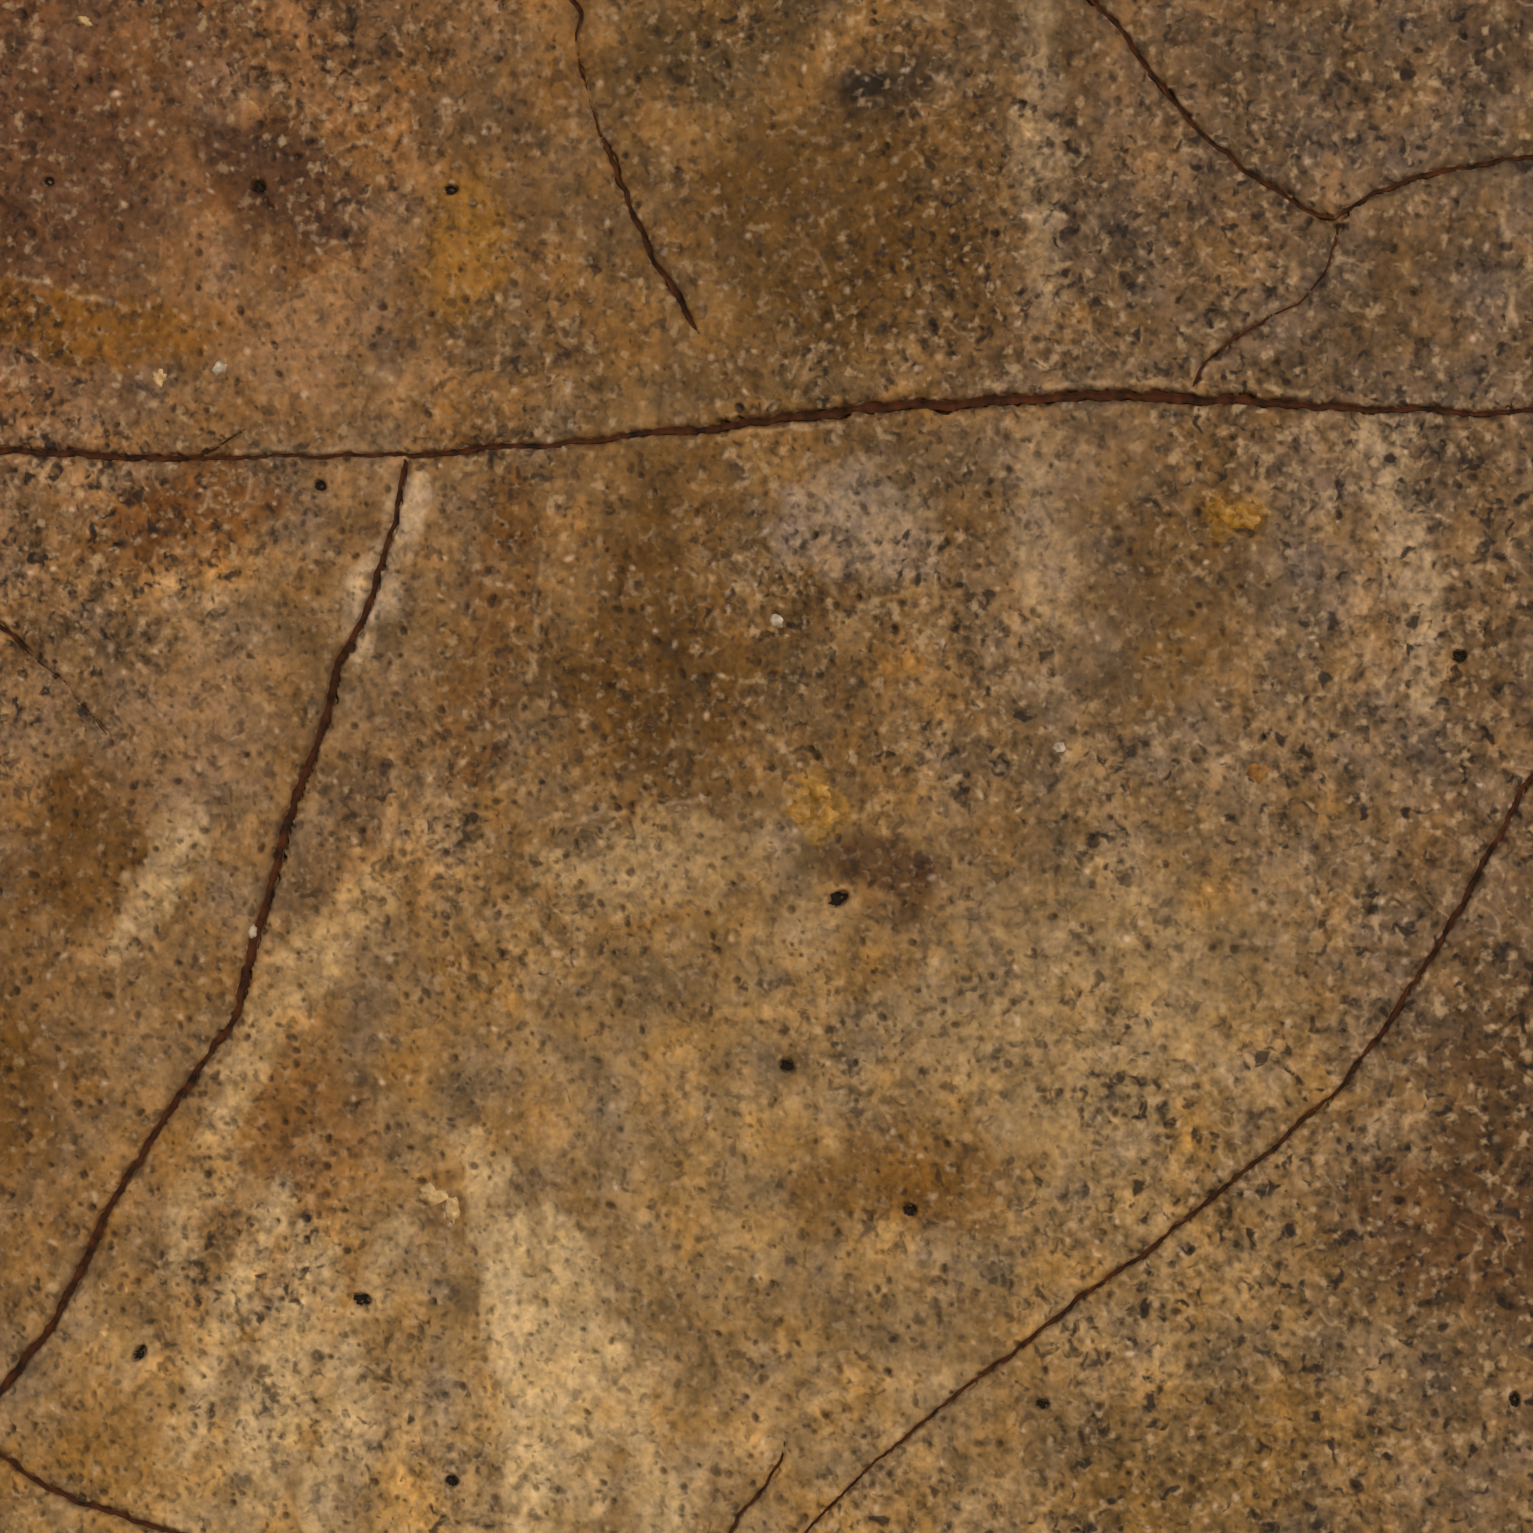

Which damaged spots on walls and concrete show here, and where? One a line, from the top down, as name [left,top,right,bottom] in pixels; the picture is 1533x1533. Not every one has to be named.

crack [570,0,700,334]
crack [1090,0,1533,387]
crack [0,389,1533,1395]
crack [805,774,1533,1533]
crack [0,1452,181,1533]
crack [729,1435,787,1533]